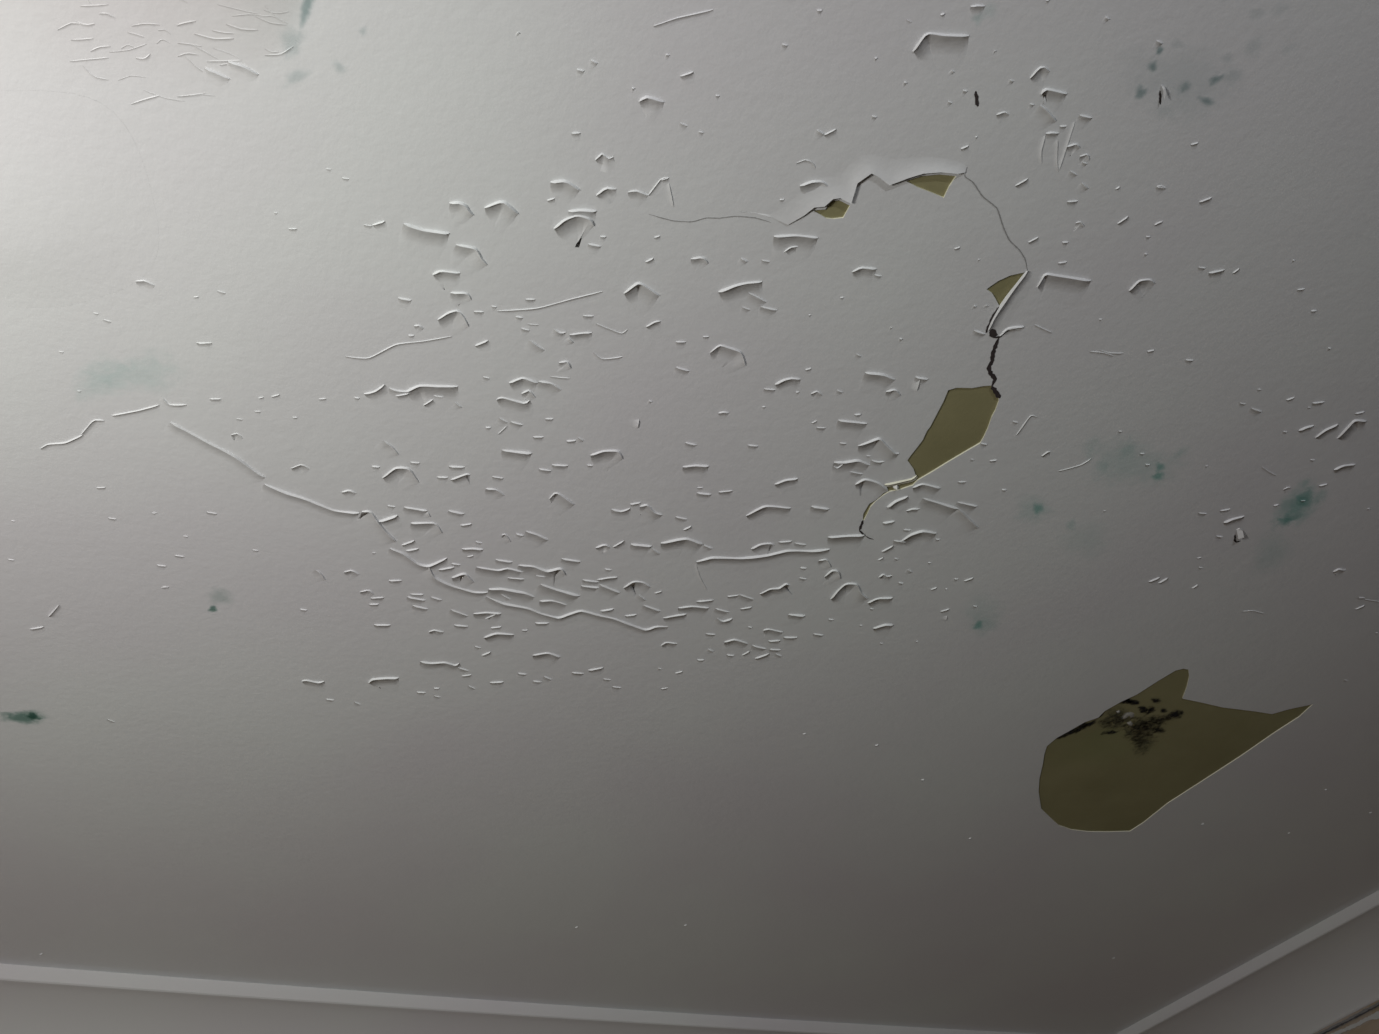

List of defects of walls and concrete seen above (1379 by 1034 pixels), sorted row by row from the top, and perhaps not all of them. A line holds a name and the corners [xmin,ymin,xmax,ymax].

peeling [749,154,967,225]
crack [964,172,1028,271]
peeling [987,271,1038,331]
crack [986,307,1024,398]
peeling [859,386,999,539]
peeling [1039,669,1313,832]